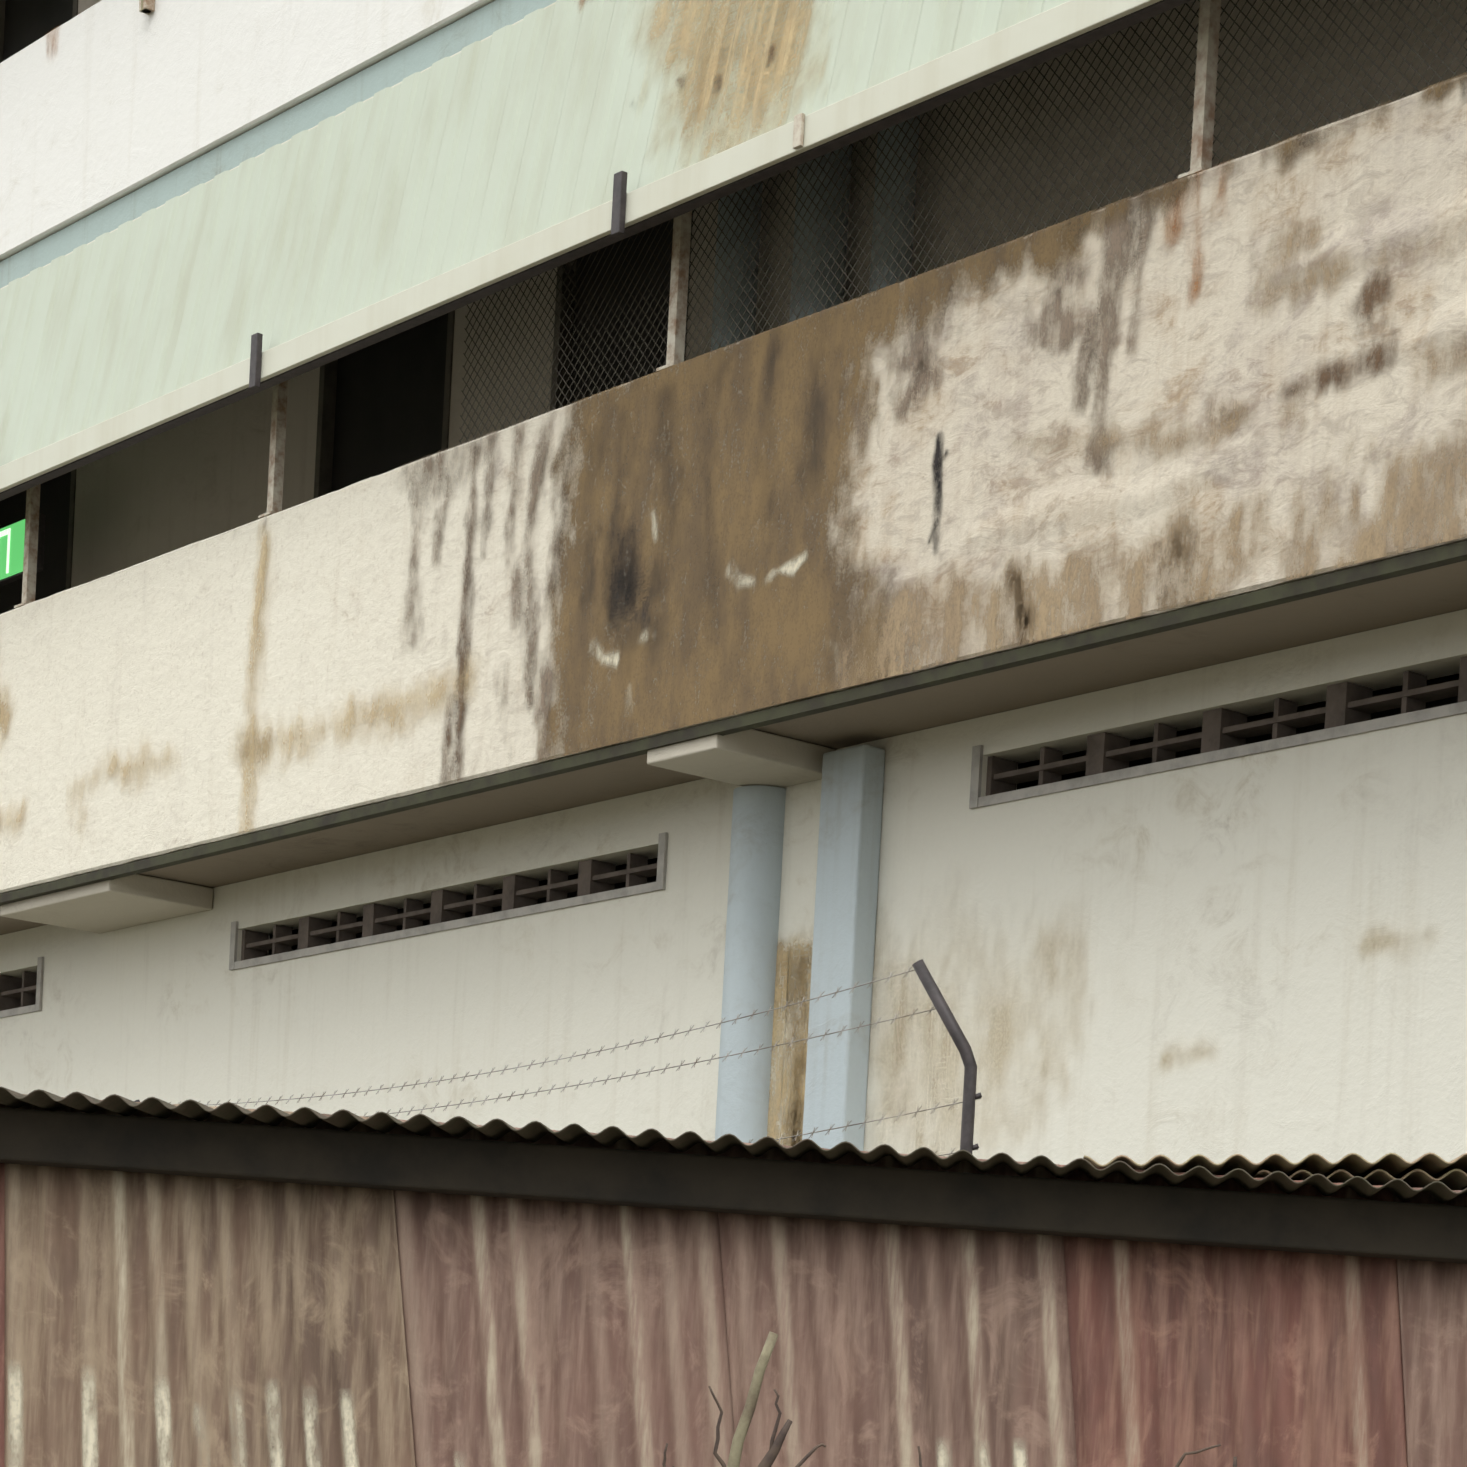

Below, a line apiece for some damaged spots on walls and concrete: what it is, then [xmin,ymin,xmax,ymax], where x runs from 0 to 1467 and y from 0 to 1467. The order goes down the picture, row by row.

damp [1276,131,1313,166]
damp [1423,73,1466,100]
damp [250,536,267,671]
damp [412,450,448,559]
damp [429,482,493,782]
damp [506,175,1189,762]
damp [1120,506,1260,620]
damp [767,942,812,1146]